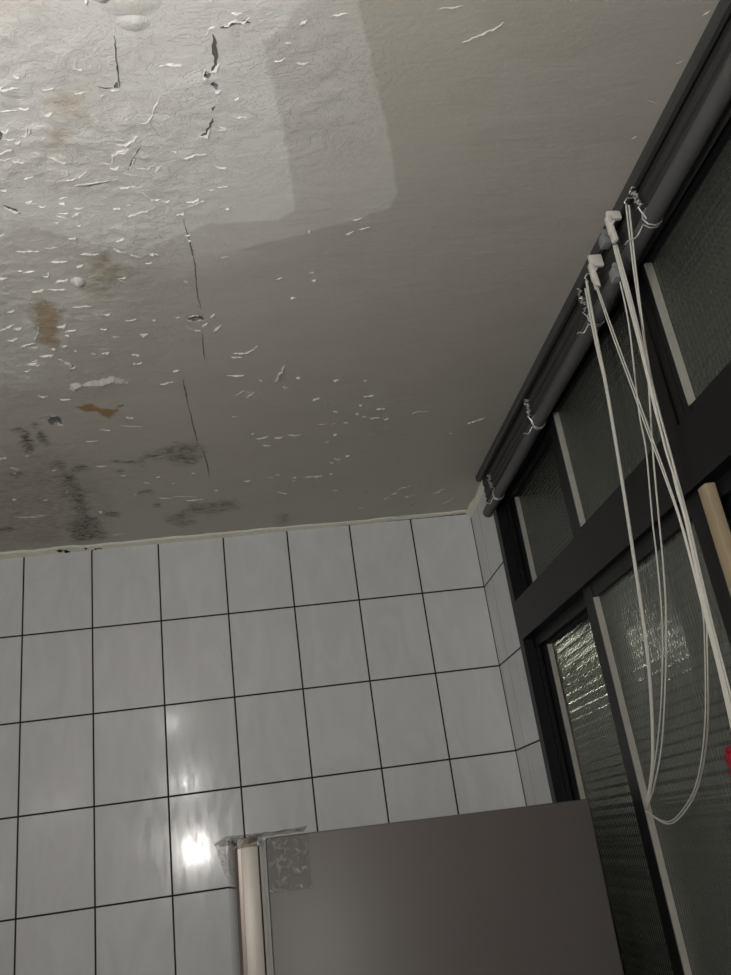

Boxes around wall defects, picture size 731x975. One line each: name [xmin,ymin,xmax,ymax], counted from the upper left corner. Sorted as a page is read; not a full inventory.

peeling [206,12,249,35]
crack [98,36,120,89]
crack [205,20,250,77]
peeling [0,75,30,112]
crack [201,106,216,136]
peeling [0,126,31,164]
peeling [65,135,170,218]
peeling [16,197,100,303]
spalling [177,302,221,332]
peeling [0,310,128,401]
corrosion [80,405,122,416]